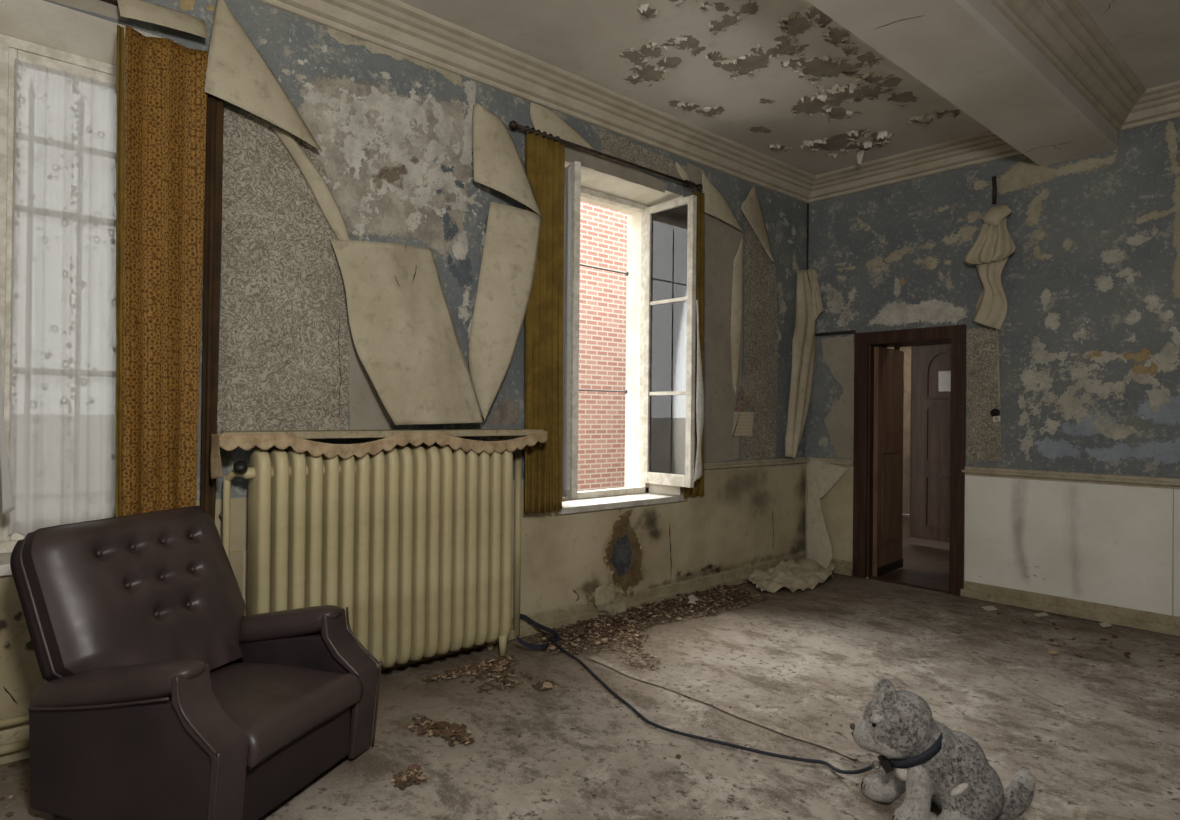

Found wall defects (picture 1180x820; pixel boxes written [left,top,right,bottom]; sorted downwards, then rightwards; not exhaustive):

peeling [276,24,489,347]
peeling [619,0,961,164]
peeling [969,148,1118,261]
peeling [1013,121,1180,467]